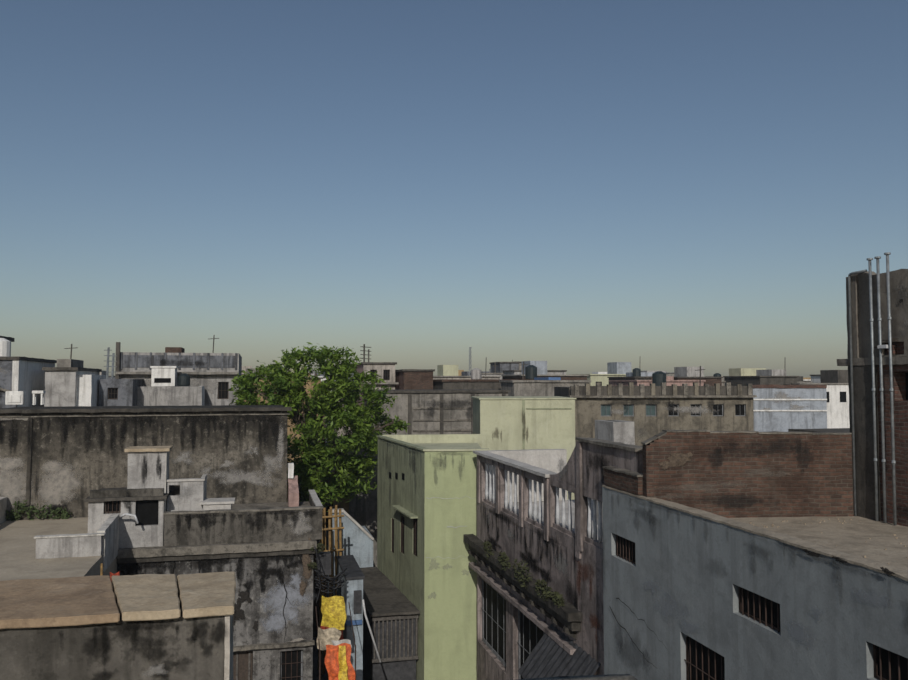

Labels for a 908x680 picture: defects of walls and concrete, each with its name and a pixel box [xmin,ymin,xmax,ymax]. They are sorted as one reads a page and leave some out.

water stain [28,416,163,478]
water stain [178,416,284,486]
water stain [86,622,188,680]
water stain [188,623,224,653]
peeling [233,554,312,632]
crack [282,580,292,639]